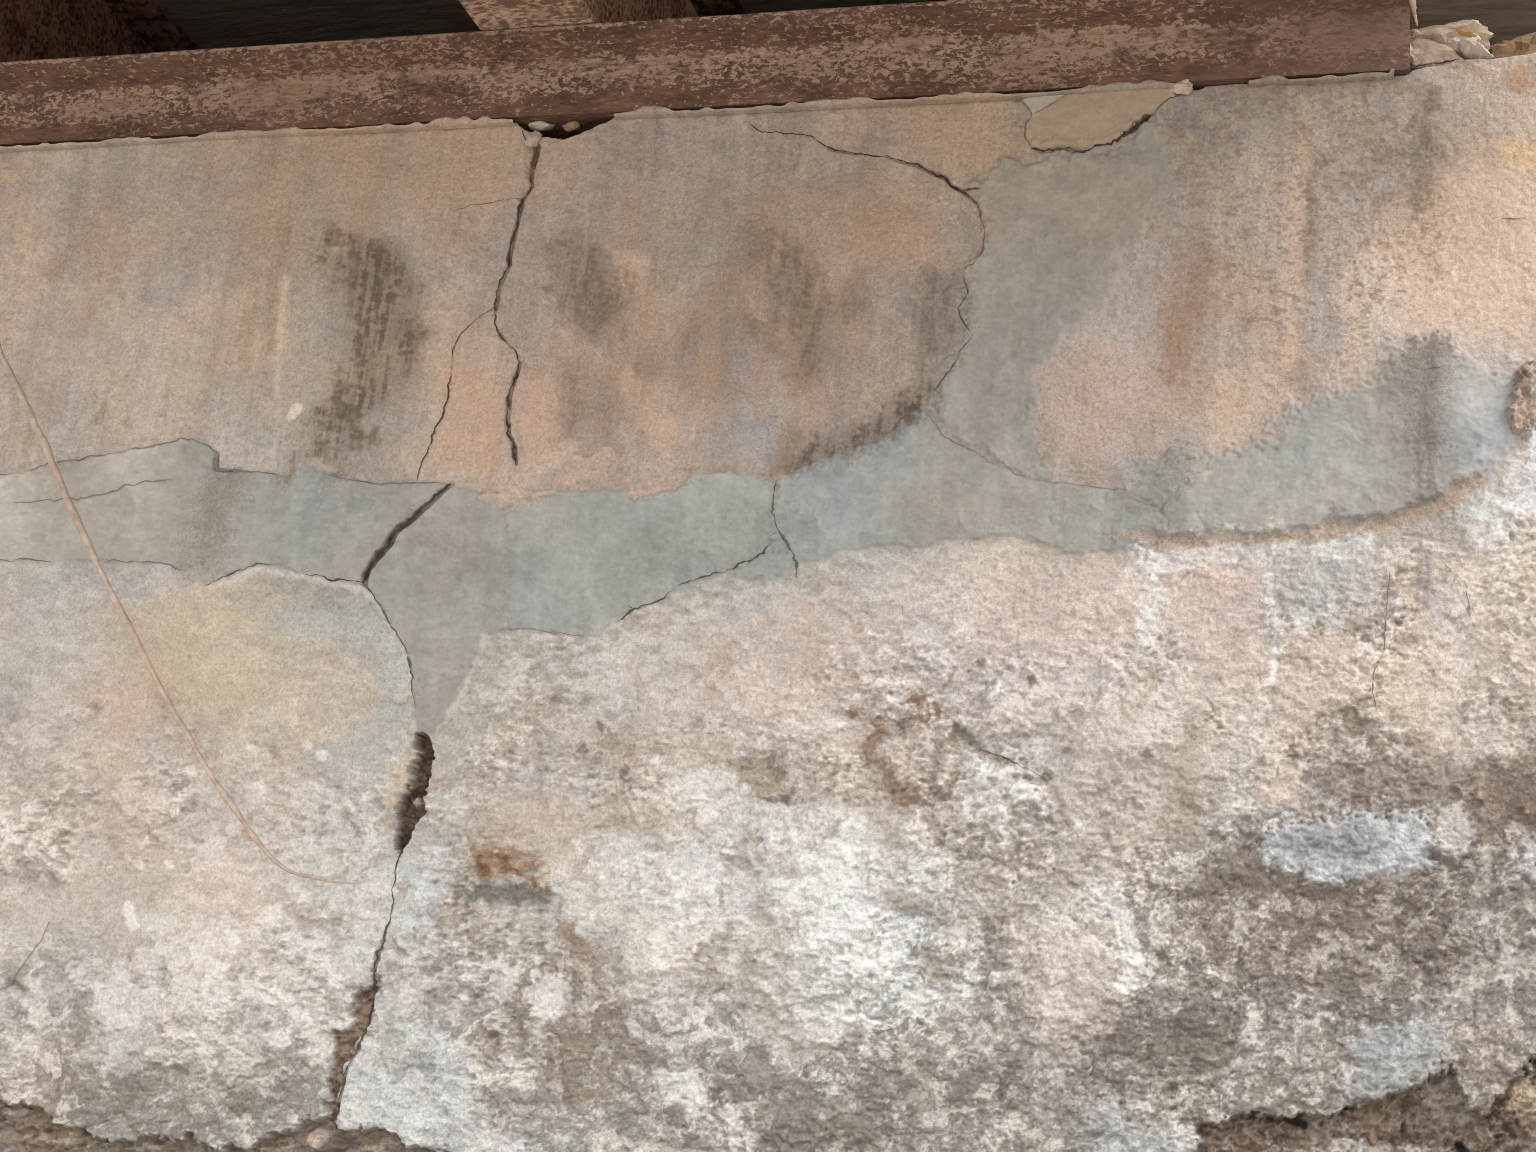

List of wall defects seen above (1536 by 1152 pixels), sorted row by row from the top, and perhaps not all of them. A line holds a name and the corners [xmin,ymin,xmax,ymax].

leakage [166,202,453,596]
leakage [512,203,662,448]
leakage [723,205,983,484]
crack [749,123,1157,507]
crack [506,480,799,637]
flaking render [0,968,544,1152]
crack [335,853,402,1123]
spalling [1070,1004,1536,1152]